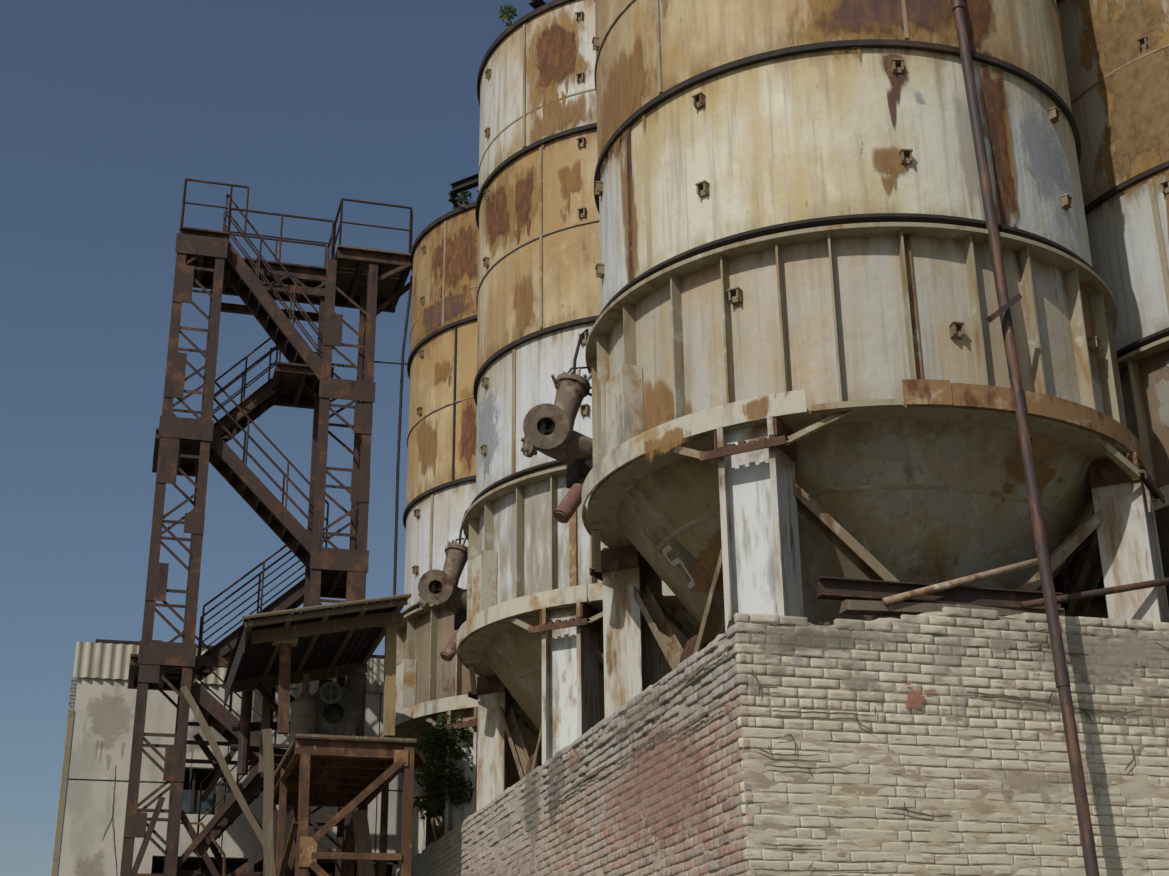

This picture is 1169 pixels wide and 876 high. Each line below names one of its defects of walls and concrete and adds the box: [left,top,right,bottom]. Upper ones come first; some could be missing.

corrosion [417,169,539,340]
corrosion [526,11,653,283]
corrosion [789,0,1020,228]
corrosion [1077,0,1169,239]
flaking render [905,682,936,708]